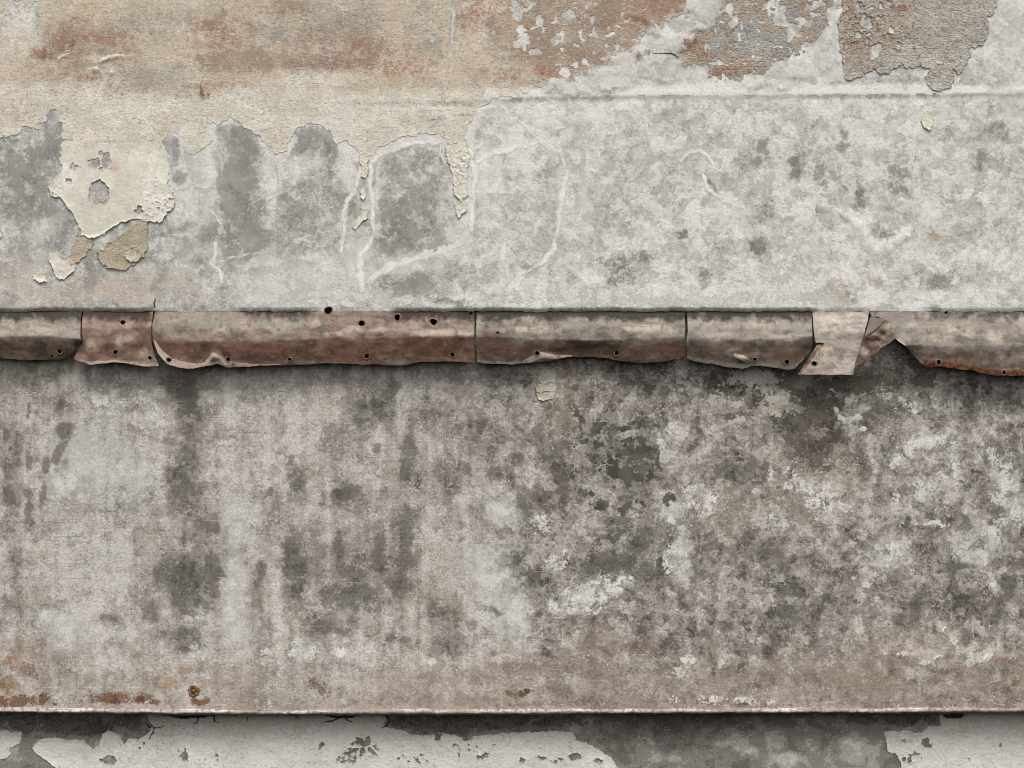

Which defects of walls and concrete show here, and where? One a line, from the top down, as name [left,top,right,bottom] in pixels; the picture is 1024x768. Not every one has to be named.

peeling [675,0,998,91]
peeling [0,0,690,282]
leakage [286,504,416,662]
leakage [544,477,724,622]
leakage [700,365,936,639]
leakage [877,431,961,508]
leakage [871,444,1024,631]
rust [0,650,57,707]
rust [81,691,172,705]
rust [185,682,211,706]
peeling [0,714,617,768]
peeling [846,713,1024,768]